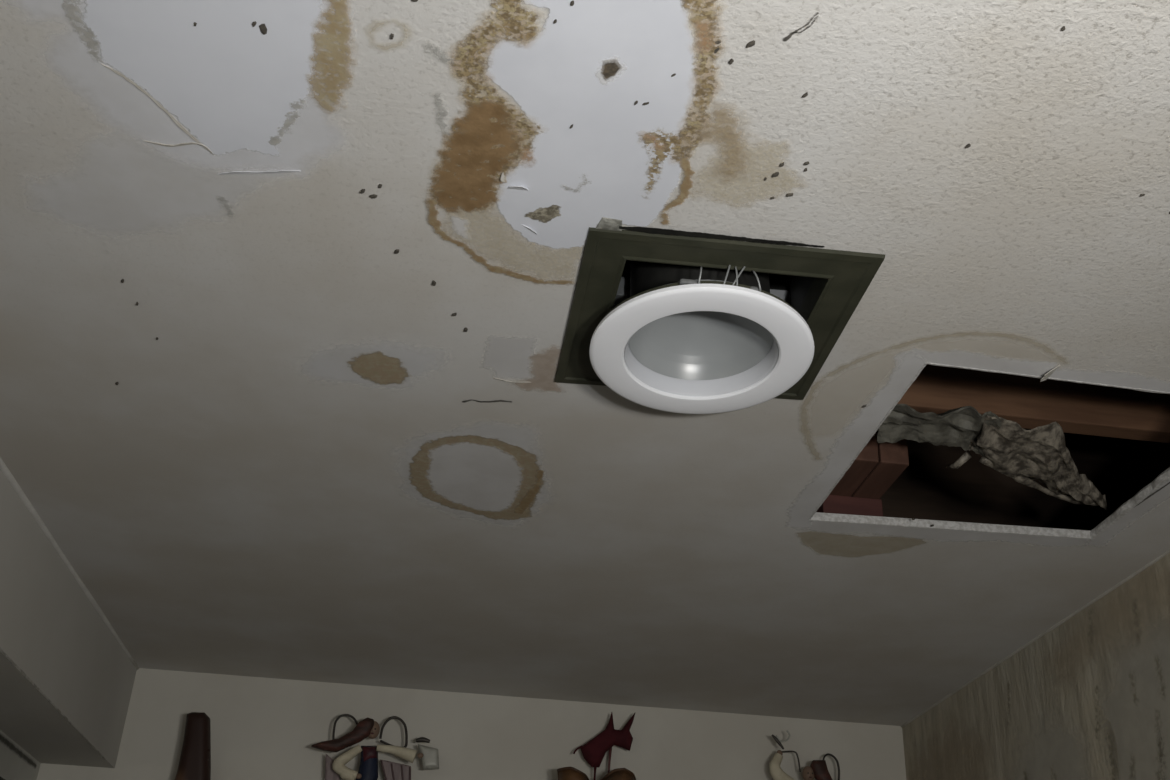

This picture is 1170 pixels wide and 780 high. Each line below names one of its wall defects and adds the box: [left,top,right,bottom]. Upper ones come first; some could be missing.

water stain [309,0,352,112]
peeling [12,0,348,234]
peeling [486,0,698,249]
water stain [698,109,799,204]
water stain [305,344,444,387]
water stain [400,423,546,525]